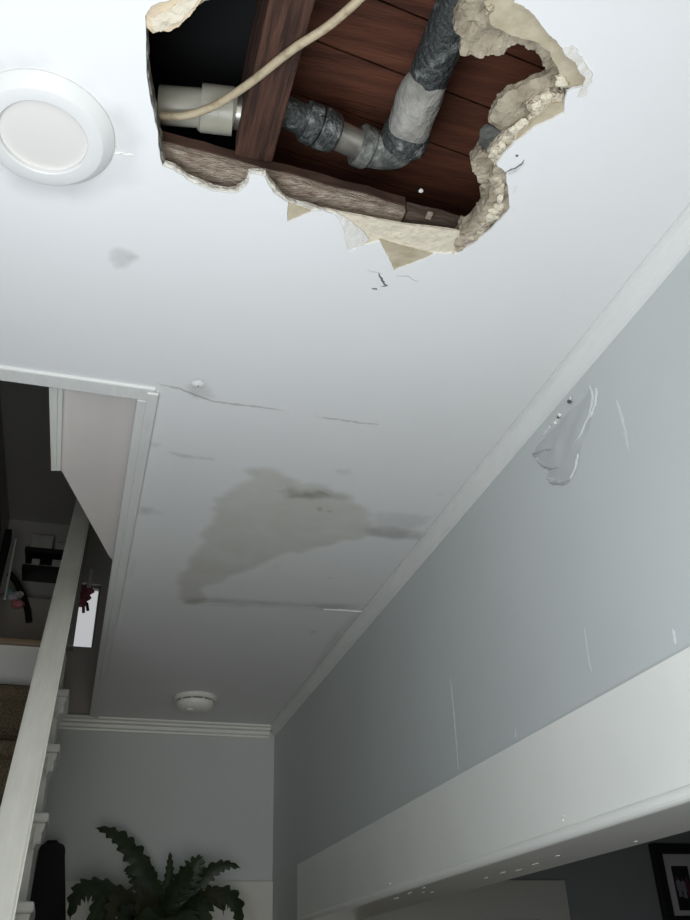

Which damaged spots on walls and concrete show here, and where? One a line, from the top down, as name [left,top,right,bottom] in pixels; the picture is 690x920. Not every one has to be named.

peeling [564,45,593,97]
spalling [146,27,319,221]
spalling [454,123,514,252]
peeling [379,238,433,270]
crack [158,383,289,412]
crack [318,416,379,425]
peeling [532,384,598,486]